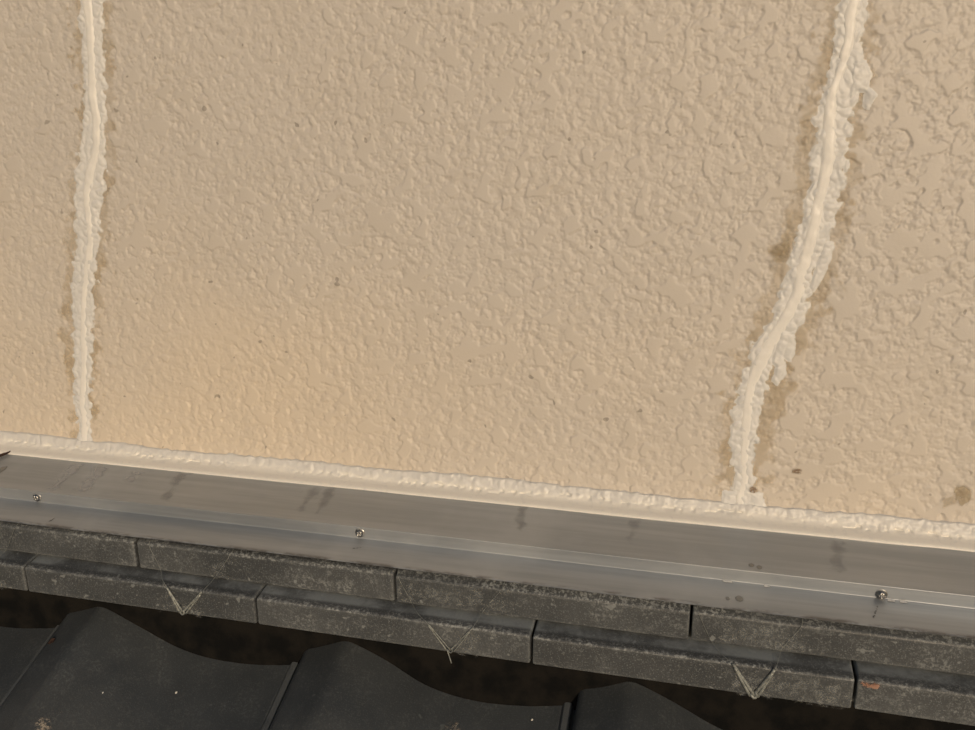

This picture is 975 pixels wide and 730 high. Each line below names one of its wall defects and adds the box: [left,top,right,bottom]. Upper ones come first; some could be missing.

crack [69,0,109,441]
crack [721,0,878,507]